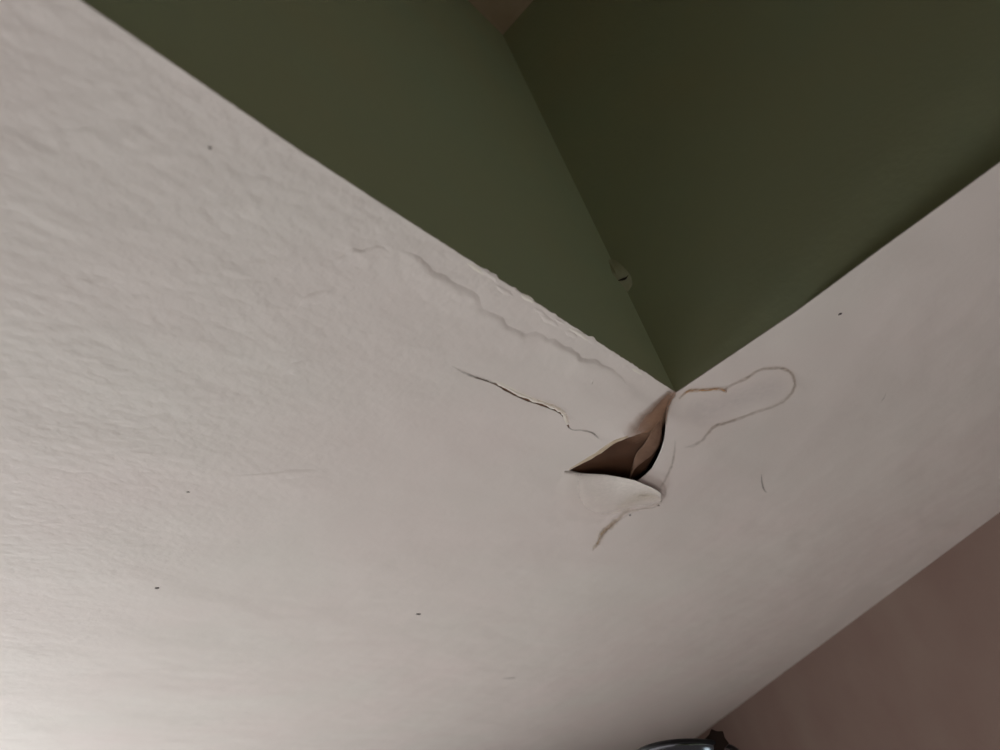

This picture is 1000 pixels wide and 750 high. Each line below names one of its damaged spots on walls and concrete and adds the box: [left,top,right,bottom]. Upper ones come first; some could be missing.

crack [474,377,595,435]
flaking render [554,413,666,546]